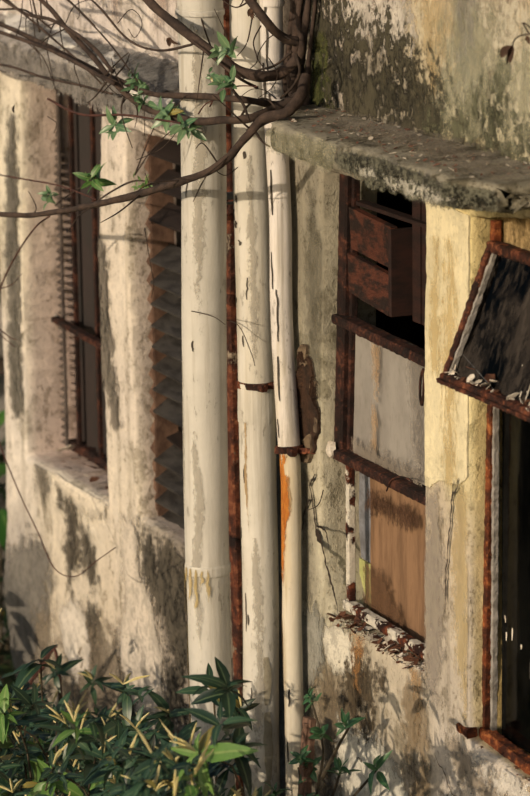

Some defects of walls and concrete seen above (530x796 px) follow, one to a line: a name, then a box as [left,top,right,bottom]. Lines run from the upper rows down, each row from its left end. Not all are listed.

damp [302,0,460,139]
damp [461,50,511,157]
spalling [295,344,321,463]
damp [33,464,101,675]
rust [280,454,292,581]
crack [445,478,459,612]
damp [31,606,56,697]
damp [315,645,387,796]